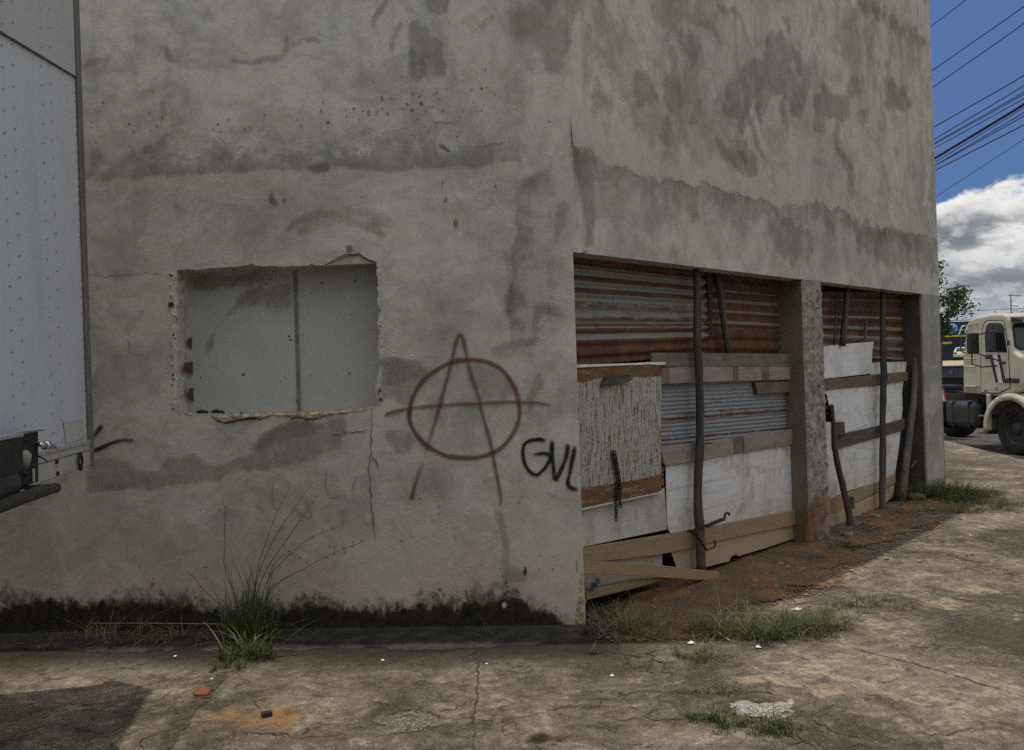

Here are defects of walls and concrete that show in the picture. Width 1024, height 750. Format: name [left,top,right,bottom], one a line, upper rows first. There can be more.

spalling [168,245,383,423]
crack [211,410,378,544]
damp [0,582,565,633]